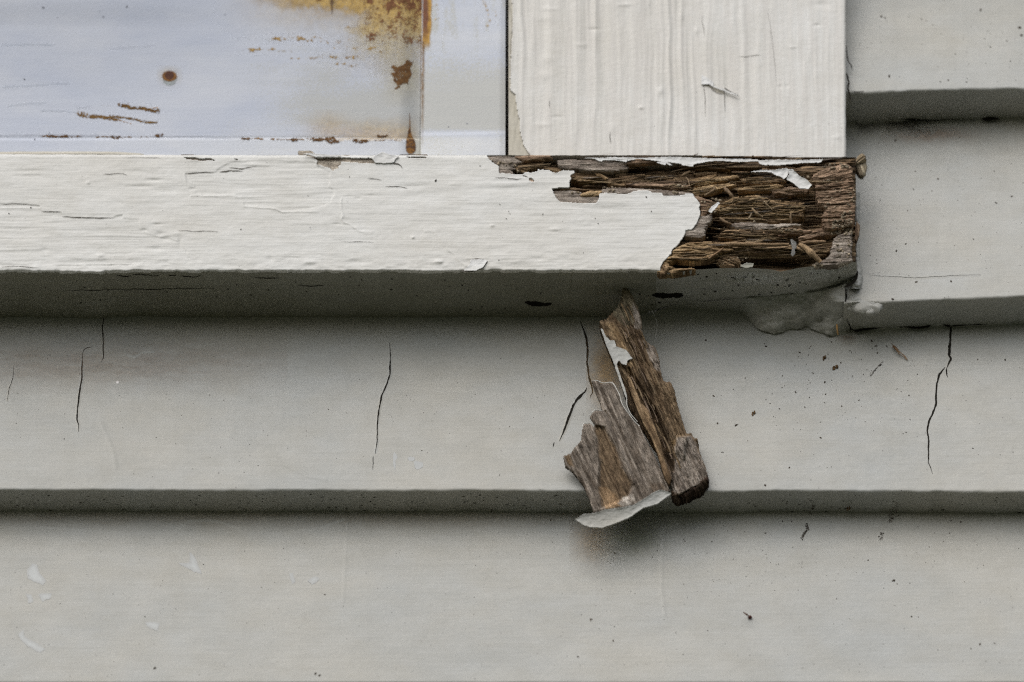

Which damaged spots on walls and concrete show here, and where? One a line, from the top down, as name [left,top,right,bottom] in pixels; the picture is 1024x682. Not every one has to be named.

rust [248,0,439,102]
rust [77,103,163,139]
rust [241,136,339,144]
rust [353,119,416,154]
peeling [585,156,823,189]
crack [74,318,106,432]
crack [374,343,393,454]
crack [553,321,595,446]
crack [927,327,954,474]